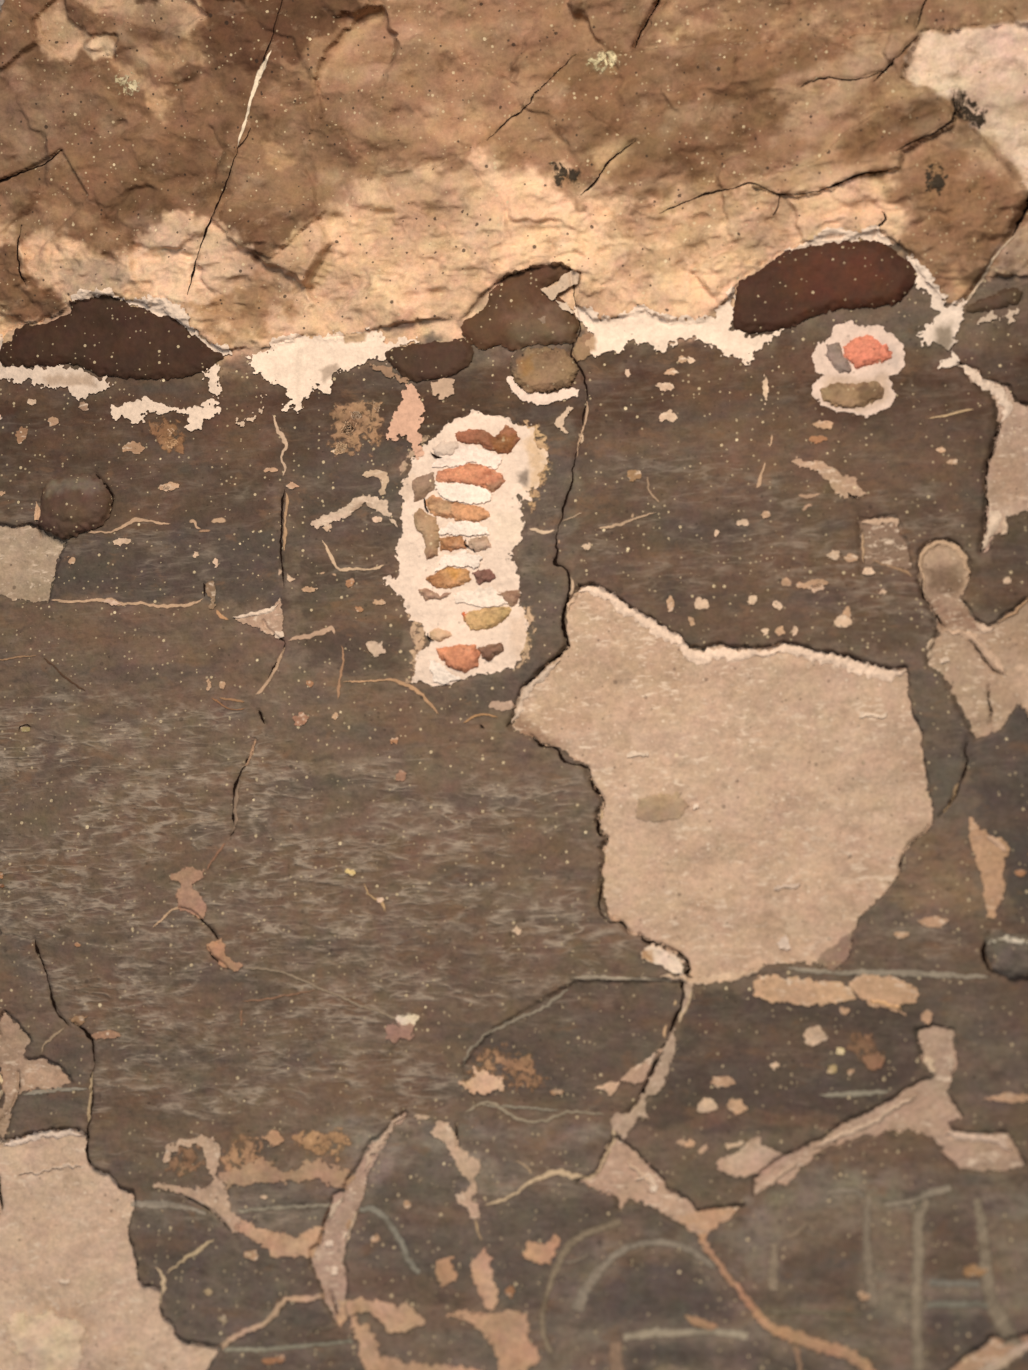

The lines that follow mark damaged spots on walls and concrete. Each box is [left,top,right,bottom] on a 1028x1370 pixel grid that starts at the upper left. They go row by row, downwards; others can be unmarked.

crack [801,0,926,87]
crack [187,0,283,295]
crack [582,140,636,194]
crack [659,89,957,215]
flaking render [791,420,867,511]
spalling [0,525,75,603]
flaking render [193,551,285,678]
spalling [310,425,520,673]
spalling [826,365,1028,739]
spalling [0,577,1028,1370]
crack [2,932,95,1165]
crack [156,1240,214,1309]